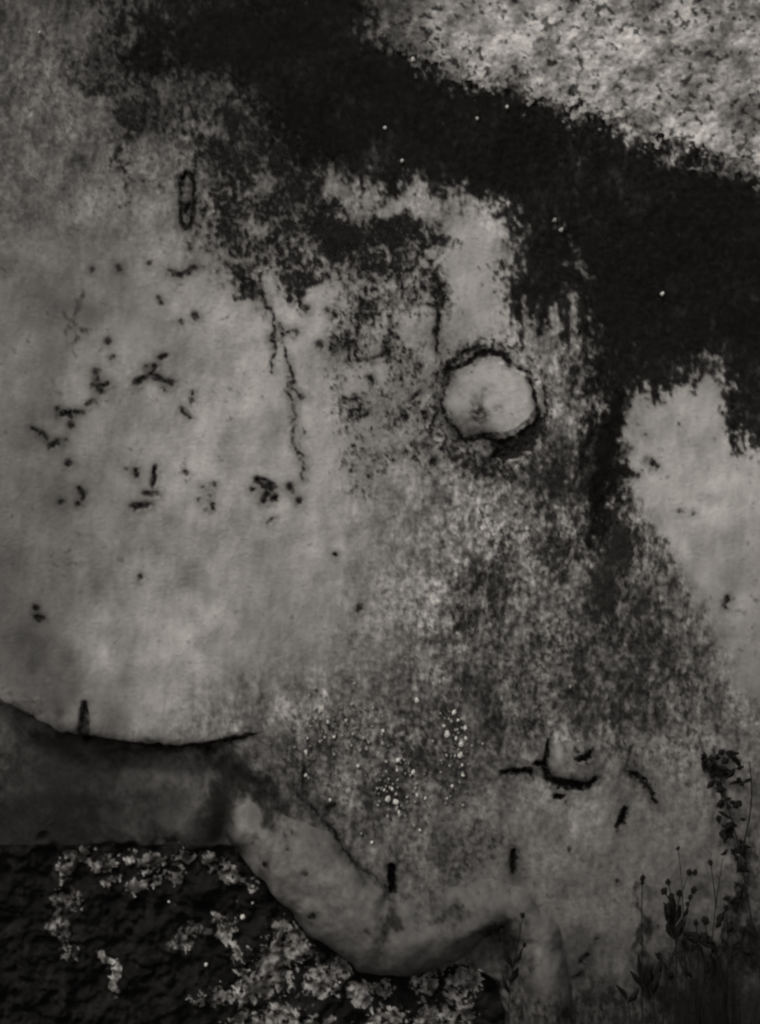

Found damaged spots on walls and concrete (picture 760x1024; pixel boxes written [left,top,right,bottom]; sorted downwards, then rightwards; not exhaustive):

crack [264,300,305,480]
damp [66,0,760,823]
damp [0,711,289,876]
crack [105,732,262,748]
crack [628,770,658,804]